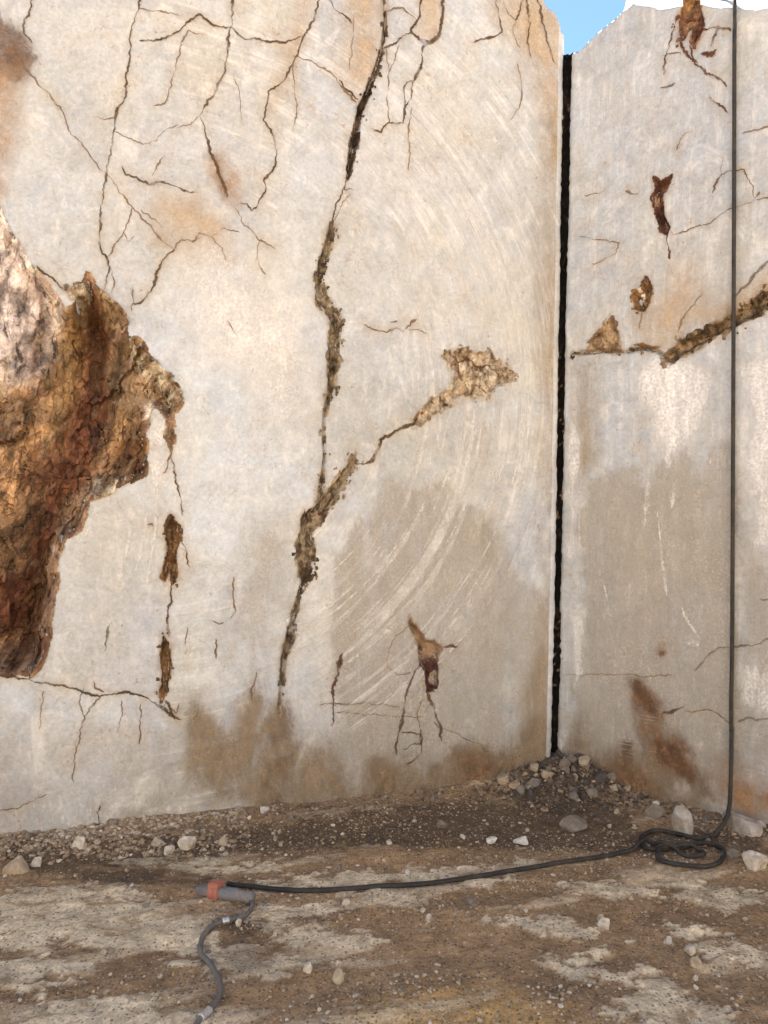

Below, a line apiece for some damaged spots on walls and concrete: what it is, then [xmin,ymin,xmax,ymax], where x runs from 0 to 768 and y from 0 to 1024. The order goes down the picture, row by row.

spalling [662,0,731,87]
crack [21,0,445,724]
peeling [198,251,299,410]
spalling [411,344,519,428]
spalling [630,275,654,329]
spalling [0,206,190,720]
leakage [305,416,548,771]
crack [0,673,197,782]
rust [632,680,709,793]